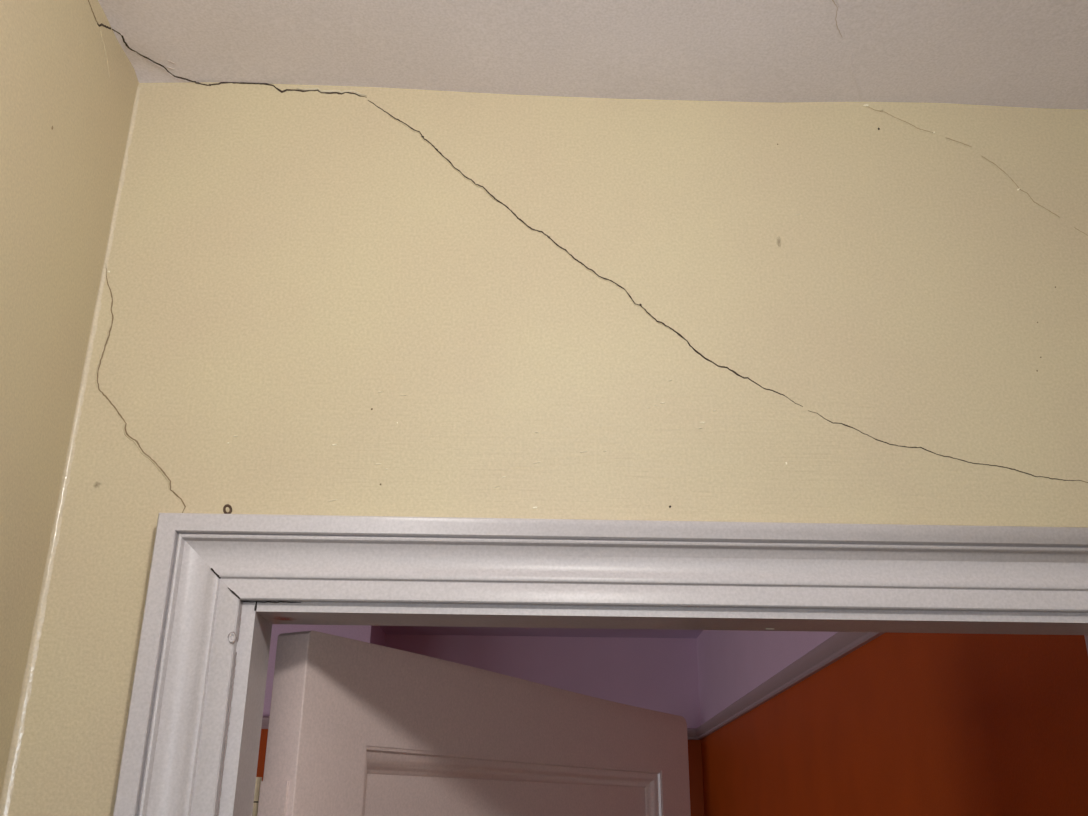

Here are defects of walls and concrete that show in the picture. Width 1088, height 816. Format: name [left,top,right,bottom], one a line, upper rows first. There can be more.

crack [88,0,1088,513]